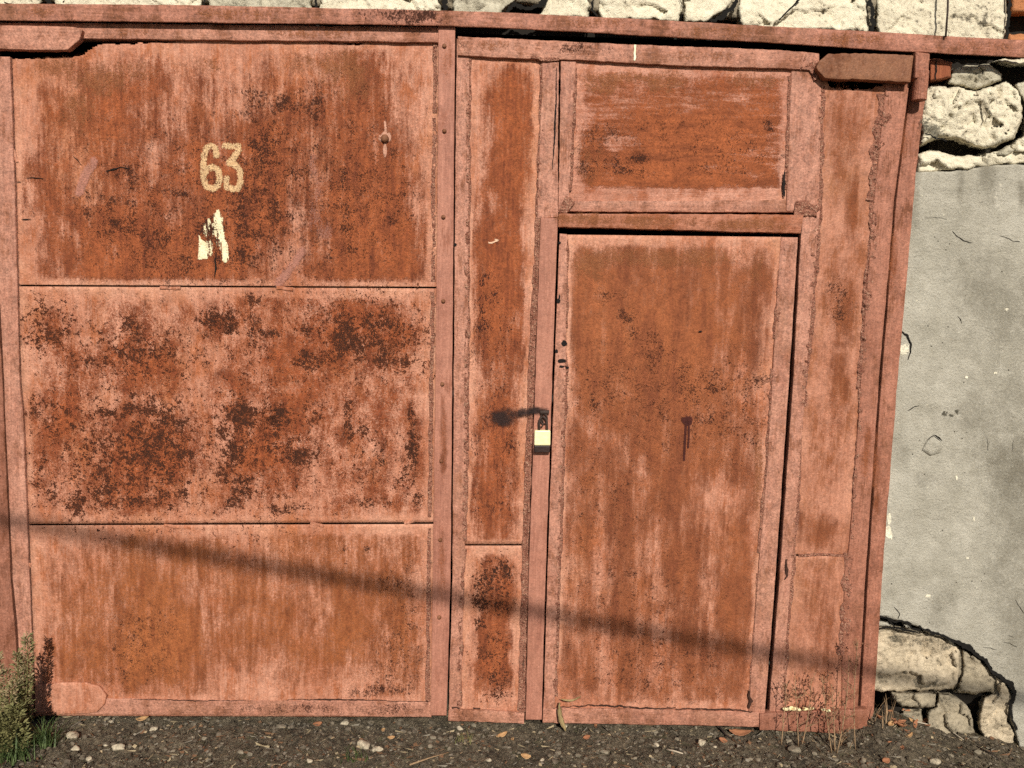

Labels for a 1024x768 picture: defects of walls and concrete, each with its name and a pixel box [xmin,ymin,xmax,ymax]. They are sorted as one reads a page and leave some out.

spalling [875,618,1015,743]